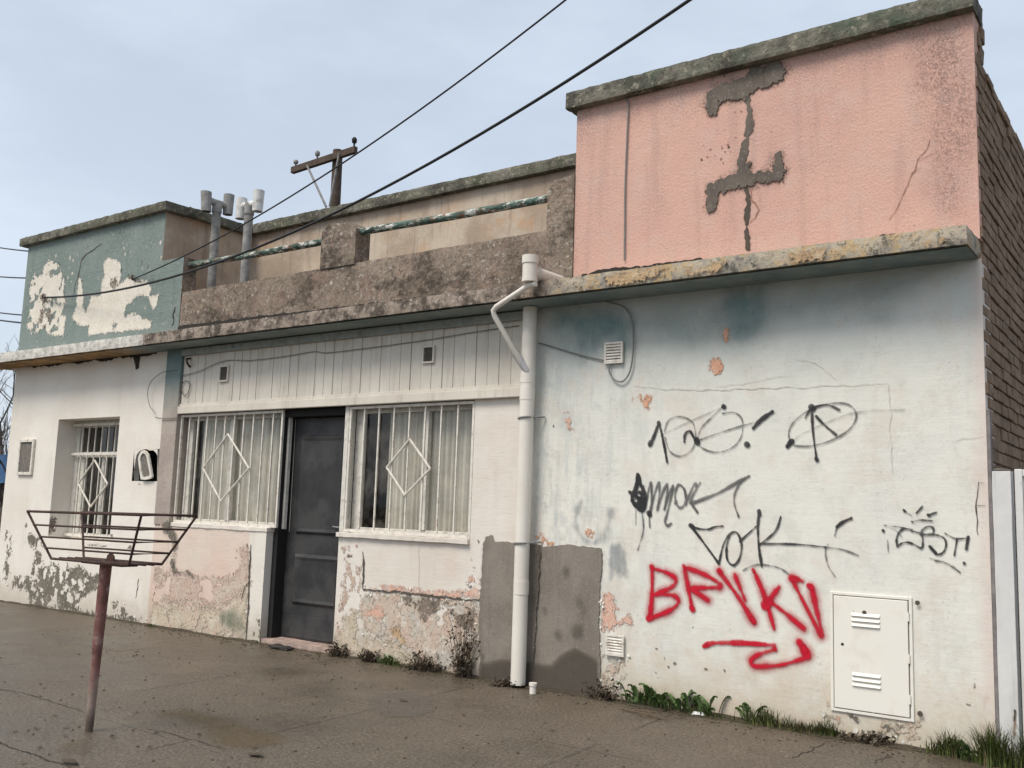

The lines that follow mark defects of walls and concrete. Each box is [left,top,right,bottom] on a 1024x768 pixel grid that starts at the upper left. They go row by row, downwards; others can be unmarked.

crack [700,60,789,251]
crack [880,139,938,236]
peeling [26,230,159,337]
peeling [708,357,723,375]
spalling [3,516,261,638]
spalling [333,544,481,673]
peeling [598,592,633,696]